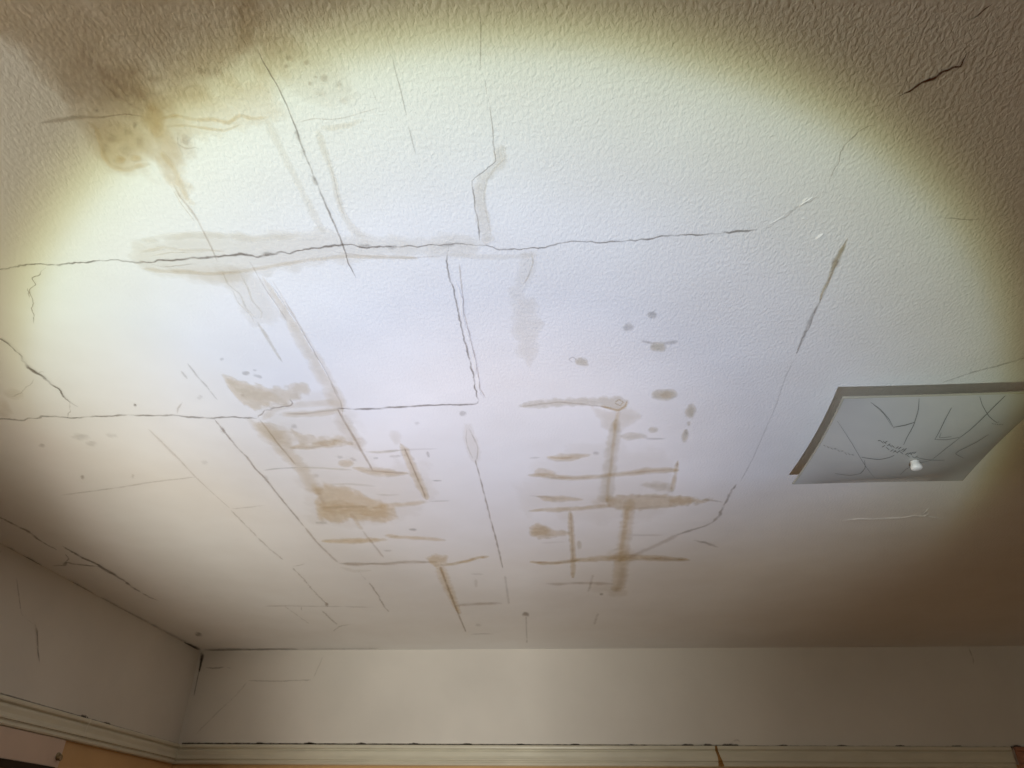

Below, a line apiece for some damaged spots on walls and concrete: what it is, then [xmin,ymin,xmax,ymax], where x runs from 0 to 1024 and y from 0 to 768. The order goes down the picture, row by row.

crack [900,56,966,96]